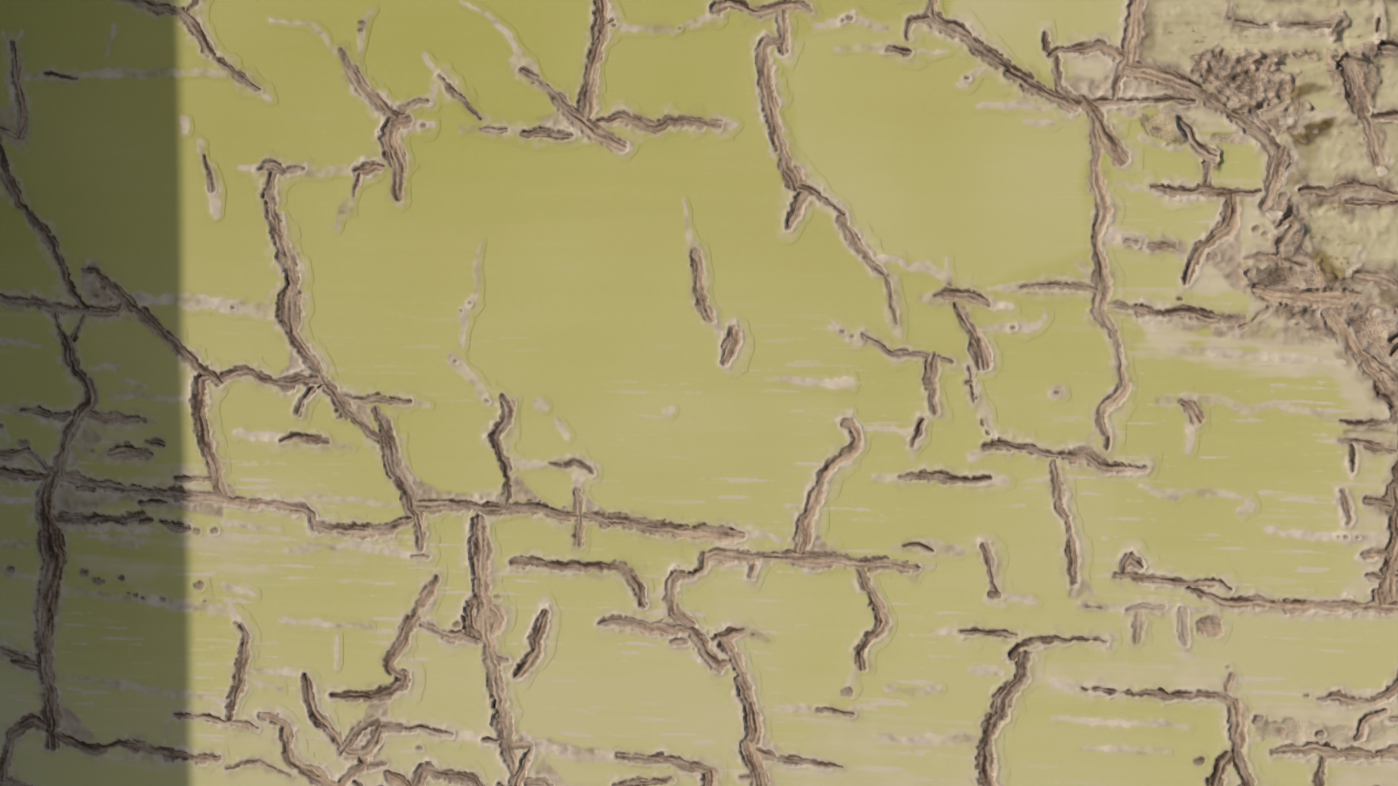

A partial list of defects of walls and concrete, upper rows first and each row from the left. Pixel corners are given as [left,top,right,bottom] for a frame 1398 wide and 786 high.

spalling [807,6,1132,116]
spalling [1102,0,1398,384]
peeling [876,249,958,287]
peeling [981,305,1055,342]
crack [699,0,1398,661]
crack [0,0,936,786]
spalling [1165,386,1216,459]
peeling [1258,520,1388,548]
spalling [1193,605,1232,648]
crack [927,615,1398,786]
peeling [1251,698,1398,746]